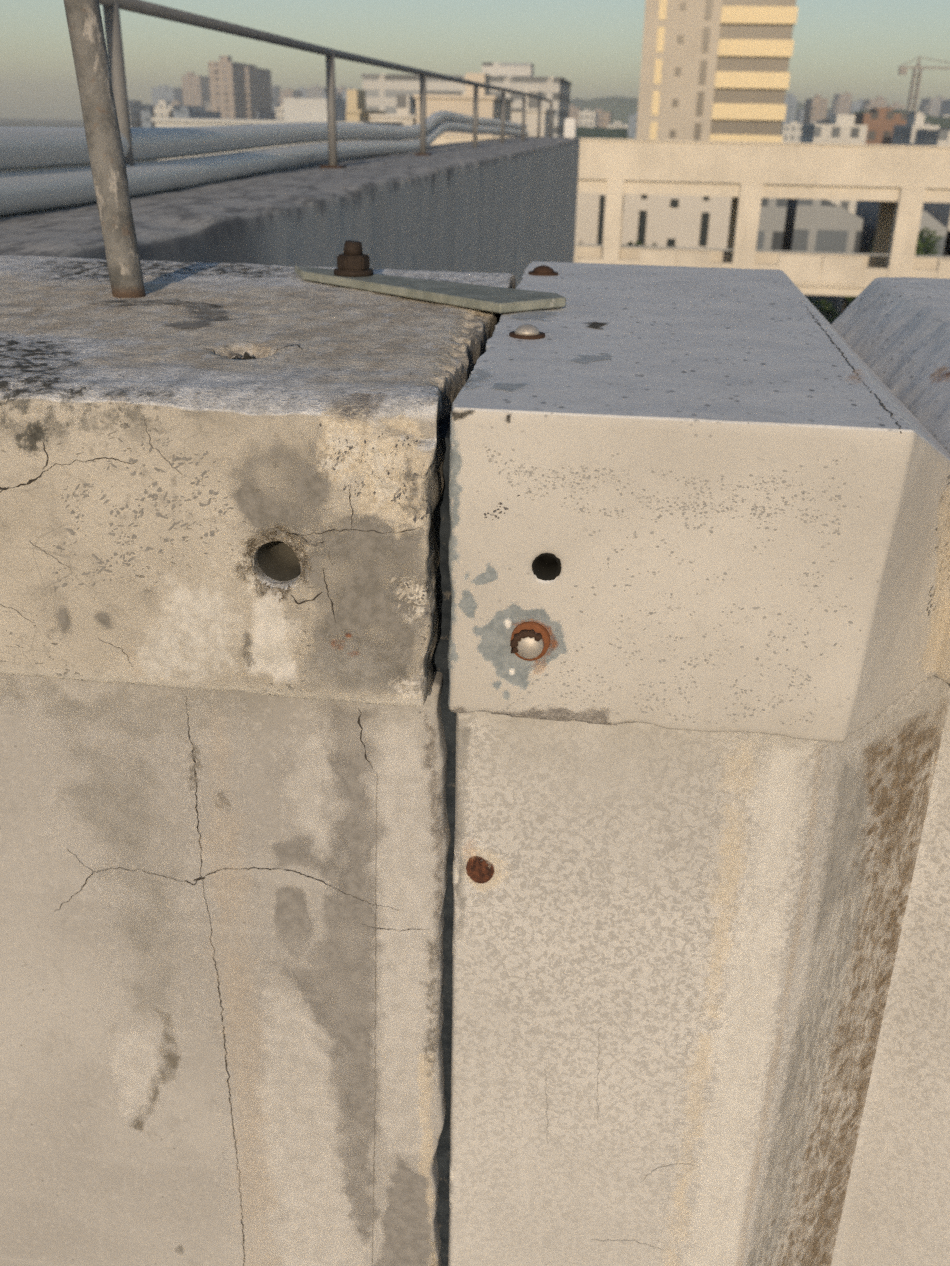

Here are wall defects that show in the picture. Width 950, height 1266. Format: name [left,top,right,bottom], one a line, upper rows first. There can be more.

crack [0,415,182,492]
flaking render [318,393,430,536]
leakage [145,590,224,674]
leakage [231,445,430,691]
spalling [397,581,435,619]
rust [510,623,557,653]
peeling [448,411,861,725]
crack [54,700,429,1266]
leakage [263,703,434,1266]
leakage [117,1012,179,1102]